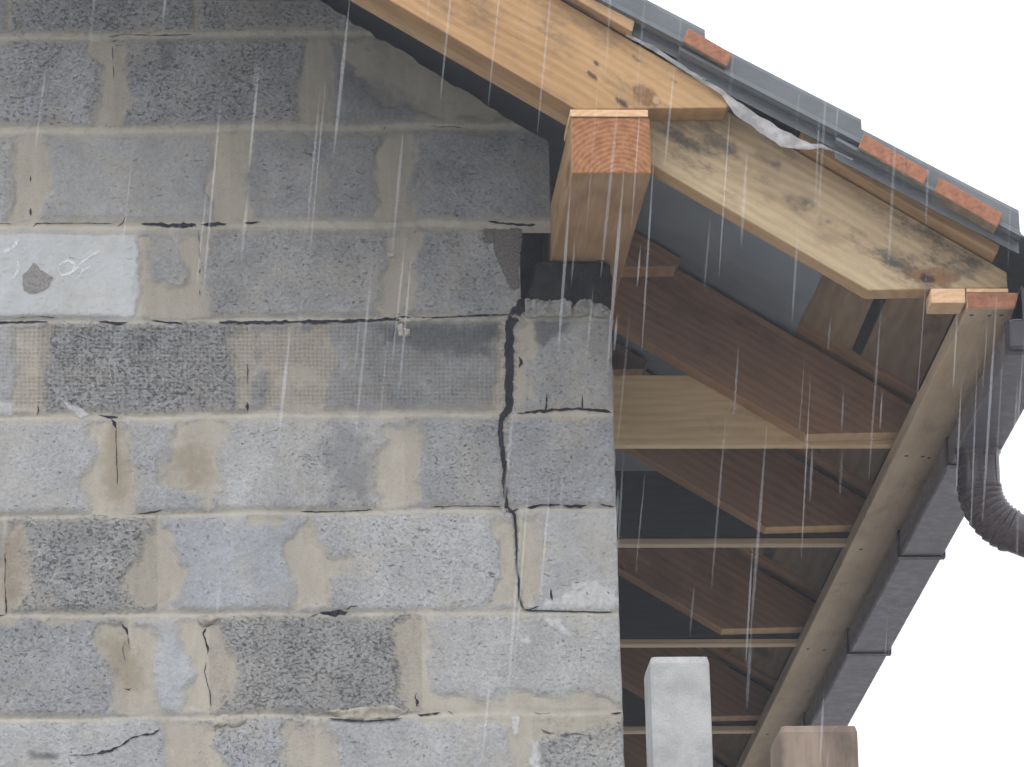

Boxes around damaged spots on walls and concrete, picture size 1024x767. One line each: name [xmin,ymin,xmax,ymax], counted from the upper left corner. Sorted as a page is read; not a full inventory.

crack [0,216,126,227]
spalling [525,298,609,317]
crack [100,415,118,483]
crack [496,298,611,613]
crack [202,624,211,704]
crack [83,729,160,756]